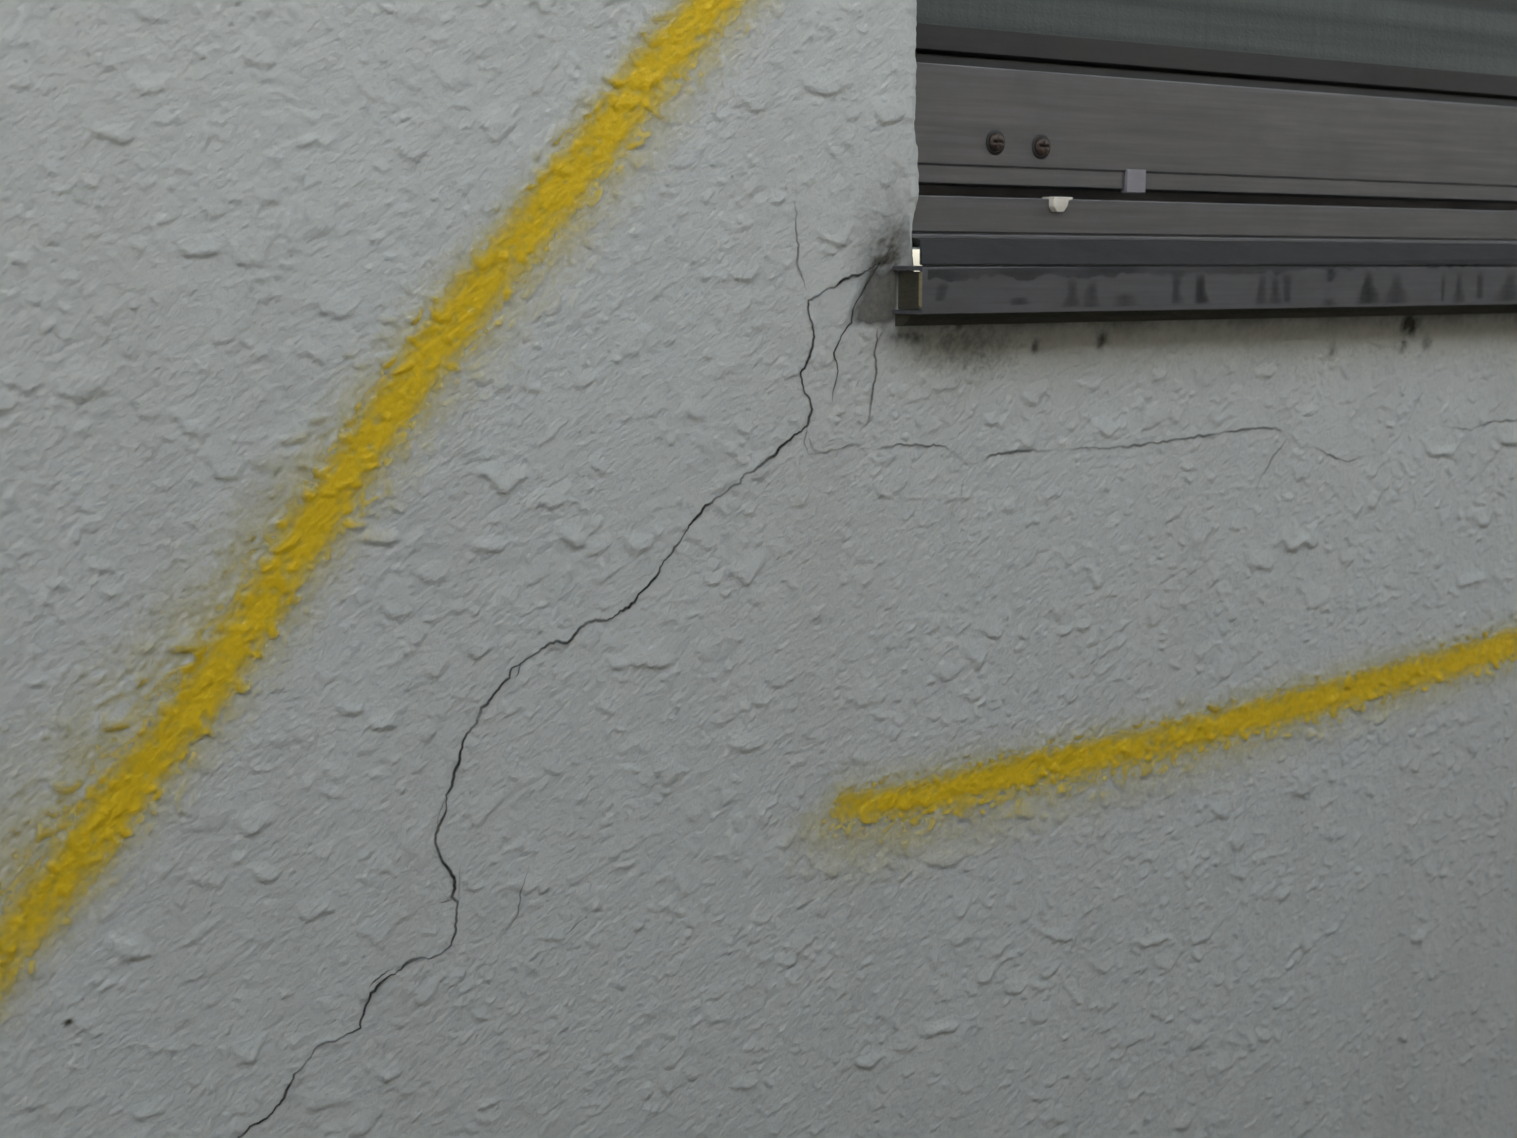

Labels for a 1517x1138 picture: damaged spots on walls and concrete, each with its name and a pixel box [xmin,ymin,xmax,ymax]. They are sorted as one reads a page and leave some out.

crack [751,231,879,472]
crack [238,499,714,1138]